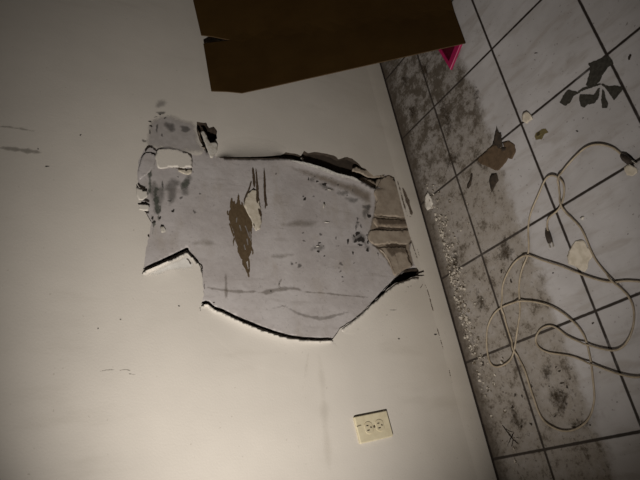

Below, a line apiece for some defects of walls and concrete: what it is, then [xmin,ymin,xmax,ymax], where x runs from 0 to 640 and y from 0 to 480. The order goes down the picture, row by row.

spalling [136,118,424,376]